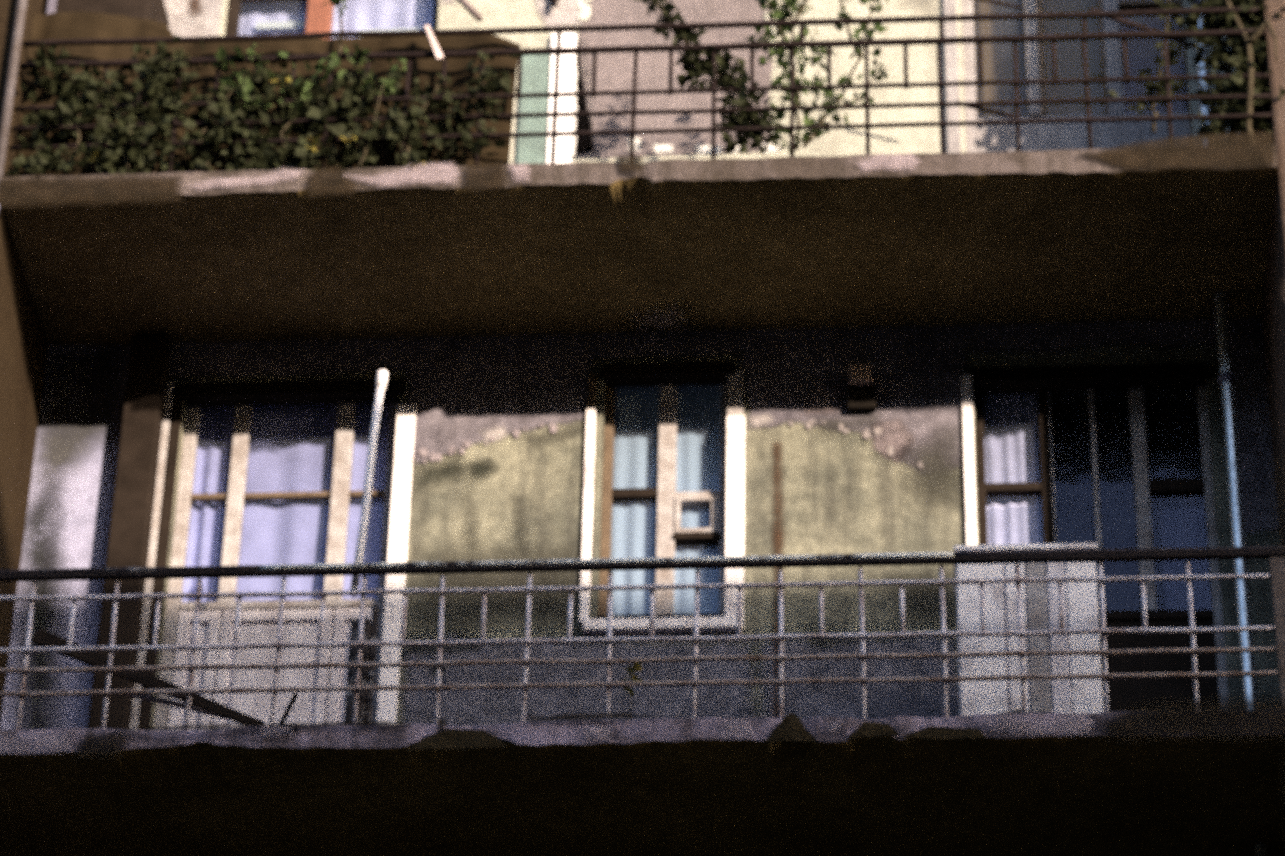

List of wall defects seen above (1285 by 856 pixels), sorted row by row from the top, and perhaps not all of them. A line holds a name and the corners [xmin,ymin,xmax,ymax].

peeling [536,0,780,171]
leakage [423,462,494,482]
leakage [916,445,955,496]
peeling [402,635,1092,750]